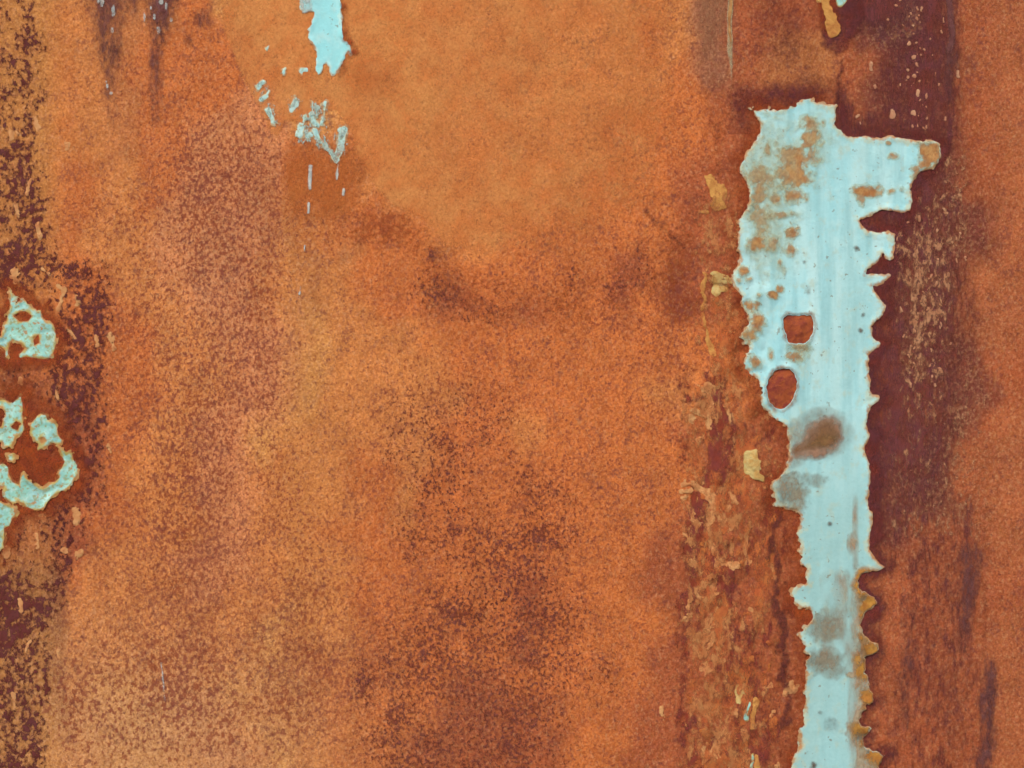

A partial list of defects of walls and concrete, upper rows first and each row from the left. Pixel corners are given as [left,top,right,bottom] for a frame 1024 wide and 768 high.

peeling [254,79,279,126]
peeling [281,0,357,76]
peeling [289,95,349,164]
peeling [0,279,68,369]
peeling [0,382,90,551]
rust [0,0,117,768]
rust [659,115,824,768]
rust [790,412,842,460]
peeling [726,91,949,768]
rust [868,0,978,768]
rust [350,383,624,768]
rust [807,568,897,768]